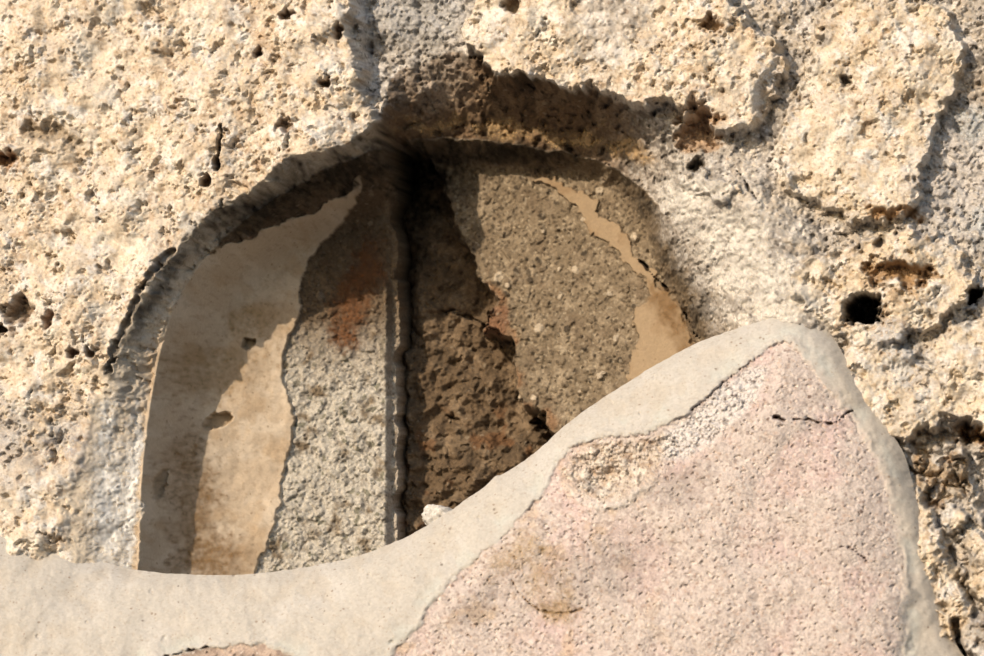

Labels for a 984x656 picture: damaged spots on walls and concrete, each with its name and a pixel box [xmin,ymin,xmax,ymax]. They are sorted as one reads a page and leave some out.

hole [316,74,333,91]
hole [273,114,296,138]
hole [687,155,706,175]
hole [199,174,212,188]
hole [241,337,256,351]
flaking render [256,148,698,574]
hole [202,411,235,431]
crack [774,410,854,426]
spalling [560,364,771,506]
spalling [140,468,170,518]